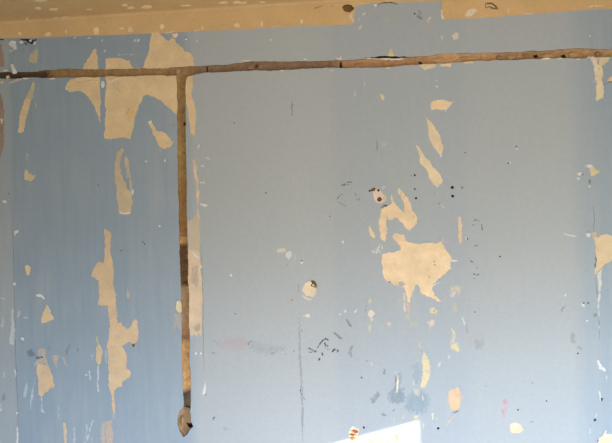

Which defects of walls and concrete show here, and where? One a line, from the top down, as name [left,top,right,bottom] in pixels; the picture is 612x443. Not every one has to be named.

peeling [18,82,37,133]
peeling [114,148,134,215]
peeling [65,24,194,140]
peeling [148,121,174,152]
peeling [185,75,196,136]
peeling [416,145,443,187]
peeling [576,56,612,101]
peeling [173,159,204,357]
peeling [369,186,458,302]
peeling [586,231,612,330]
peeling [91,229,139,443]
peeling [23,347,68,414]